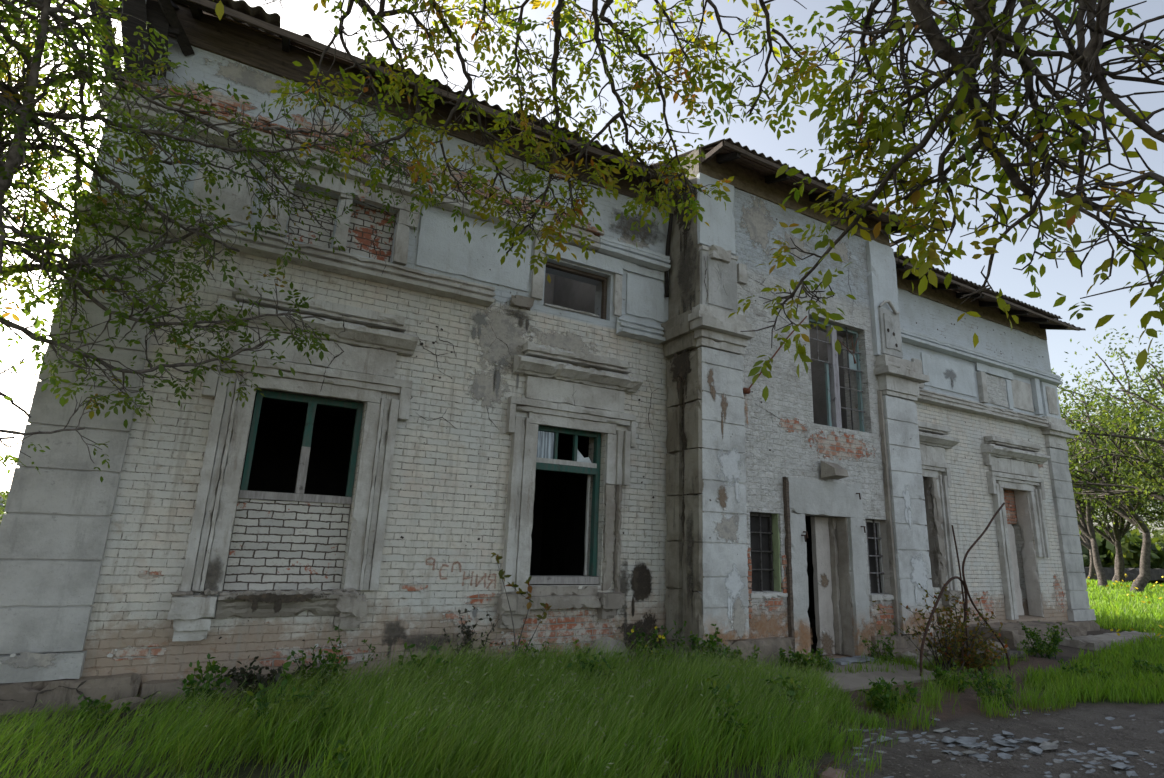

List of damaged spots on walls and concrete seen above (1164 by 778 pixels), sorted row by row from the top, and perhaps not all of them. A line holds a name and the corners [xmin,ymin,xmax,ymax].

flaking render [774,416,876,461]
flaking render [465,593,498,608]
leakage [618,562,665,655]